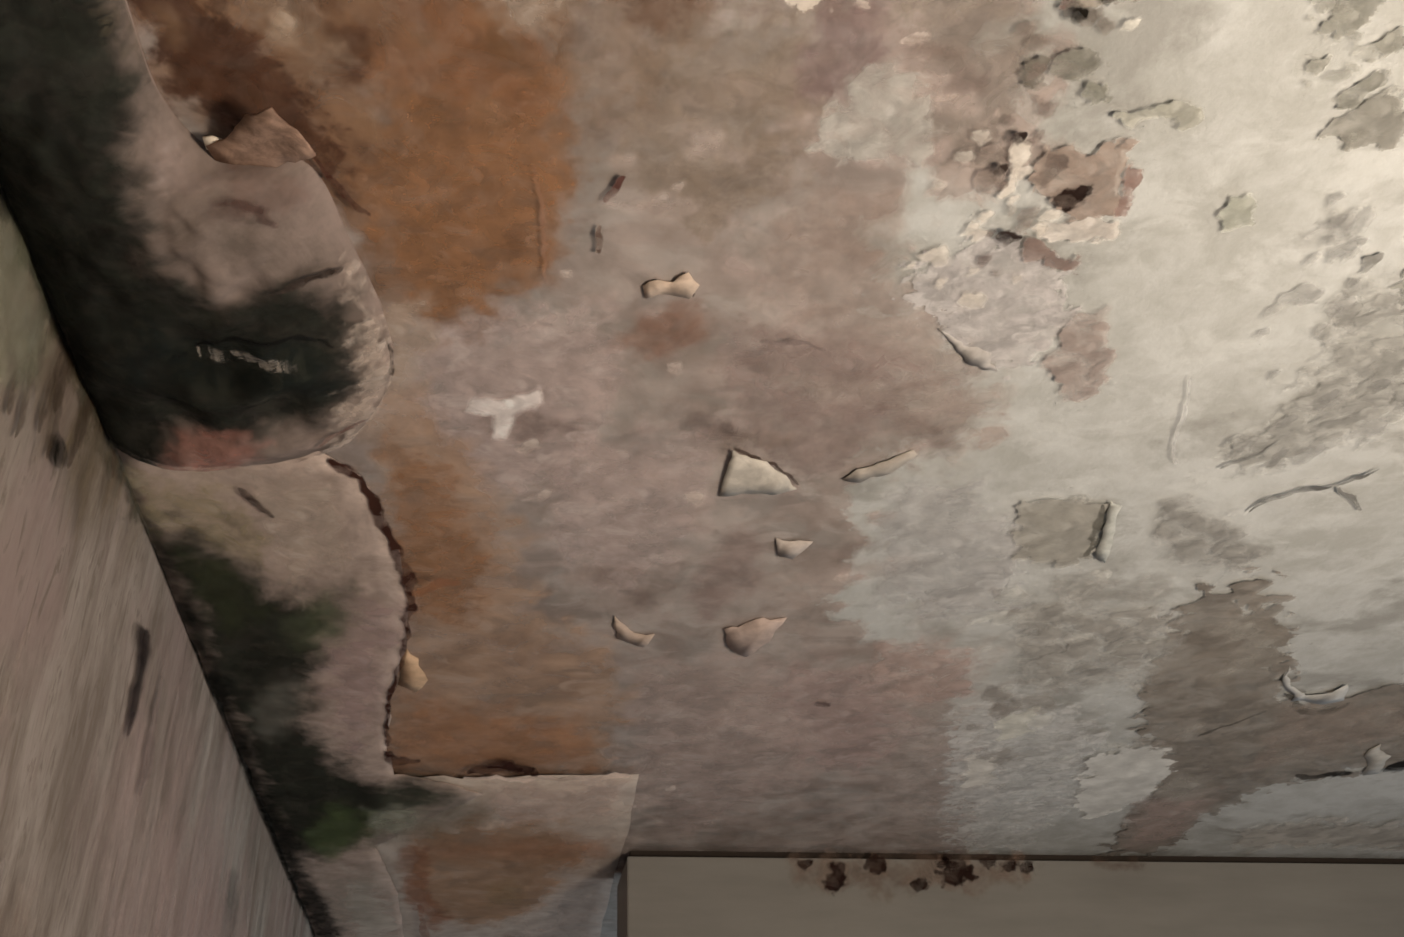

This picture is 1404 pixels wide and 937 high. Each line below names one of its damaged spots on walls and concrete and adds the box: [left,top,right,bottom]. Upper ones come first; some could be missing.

peeling [1311,0,1404,151]
leakage [0,0,627,937]
spalling [116,0,1204,937]
peeling [1228,194,1404,469]
crack [328,458,457,765]
crack [467,760,539,776]
corrosion [824,862,846,891]
corrosion [865,854,886,875]
corrosion [910,853,1033,891]
peeling [1074,500,1404,857]